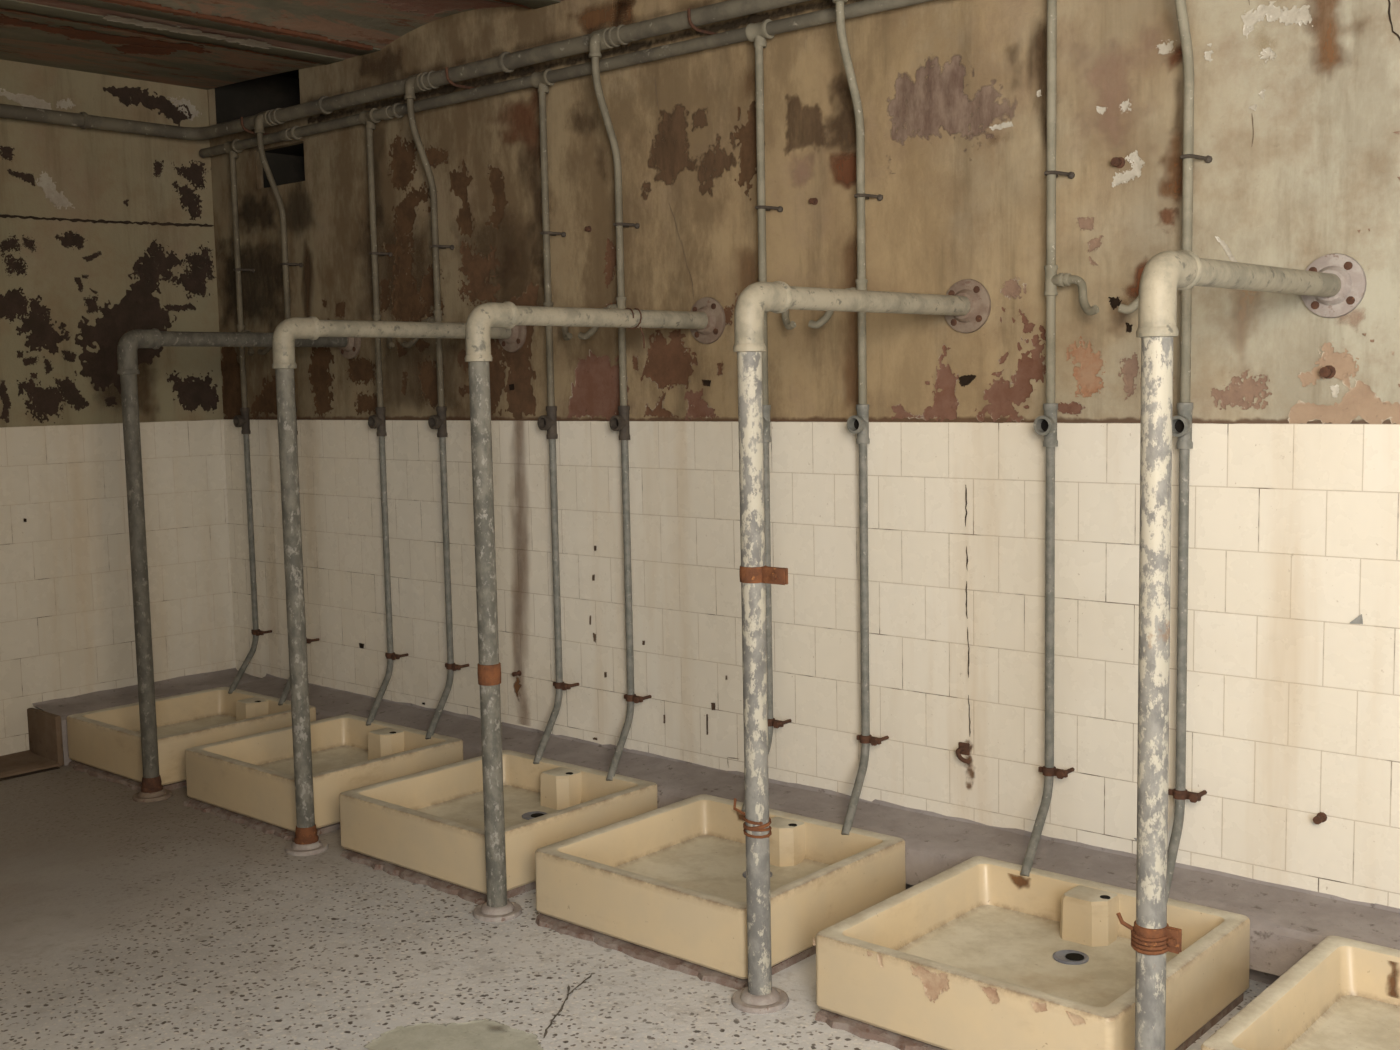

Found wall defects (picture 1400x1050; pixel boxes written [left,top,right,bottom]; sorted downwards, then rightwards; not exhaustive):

crack [1388,0,1400,40]
peeling [888,55,1016,151]
damp [238,192,311,229]
damp [528,156,542,221]
peeling [641,100,757,201]
peeling [0,230,216,423]
damp [224,246,283,327]
damp [303,246,312,317]
peeling [379,130,539,420]
peeling [891,277,1046,423]
peeling [1288,341,1400,424]
crack [543,975,592,1038]